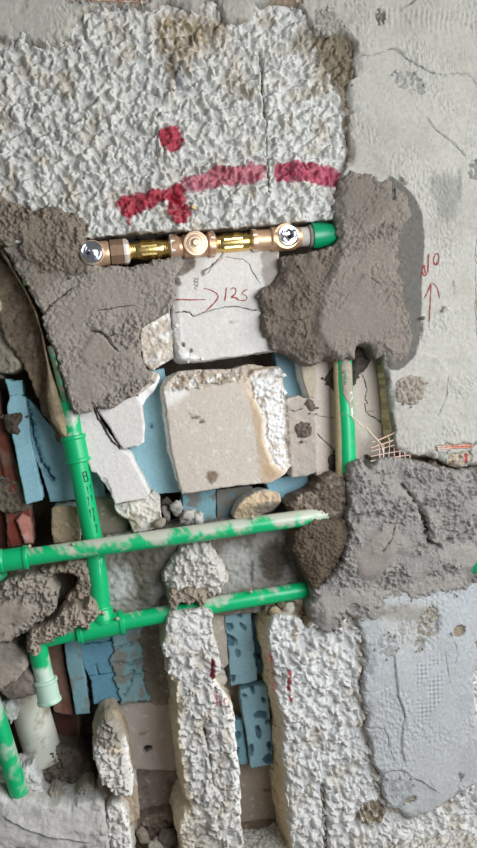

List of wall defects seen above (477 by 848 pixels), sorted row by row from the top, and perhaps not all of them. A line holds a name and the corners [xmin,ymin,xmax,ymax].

spalling [312,5,355,162]
crack [362,48,476,83]
flaking render [0,328,24,375]
spalling [172,324,204,363]
spalling [169,369,242,391]
spalling [252,368,287,465]
crack [361,373,381,422]
spalling [434,440,477,467]
peeling [374,631,401,661]
spalling [414,605,443,652]
spalling [450,625,467,636]
crack [372,664,434,790]